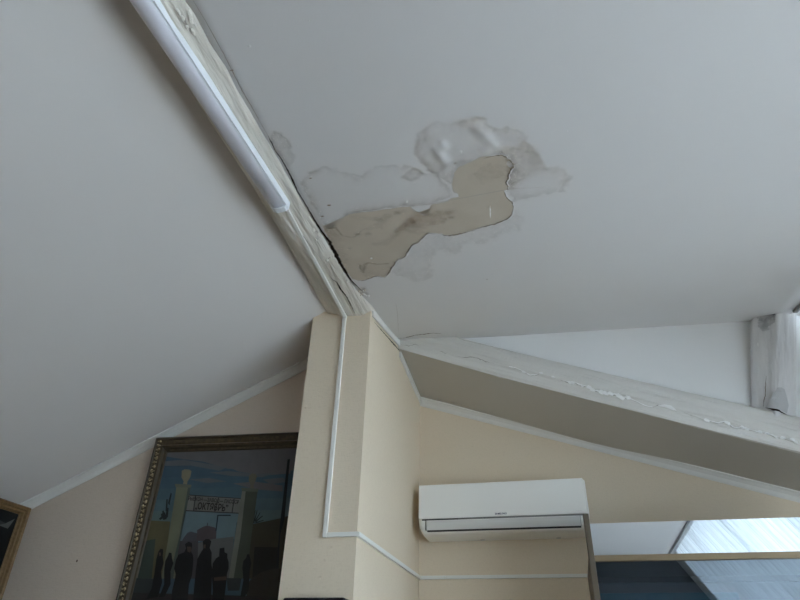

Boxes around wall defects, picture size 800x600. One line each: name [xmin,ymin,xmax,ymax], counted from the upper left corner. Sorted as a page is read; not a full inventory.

peeling [312,153,516,297]